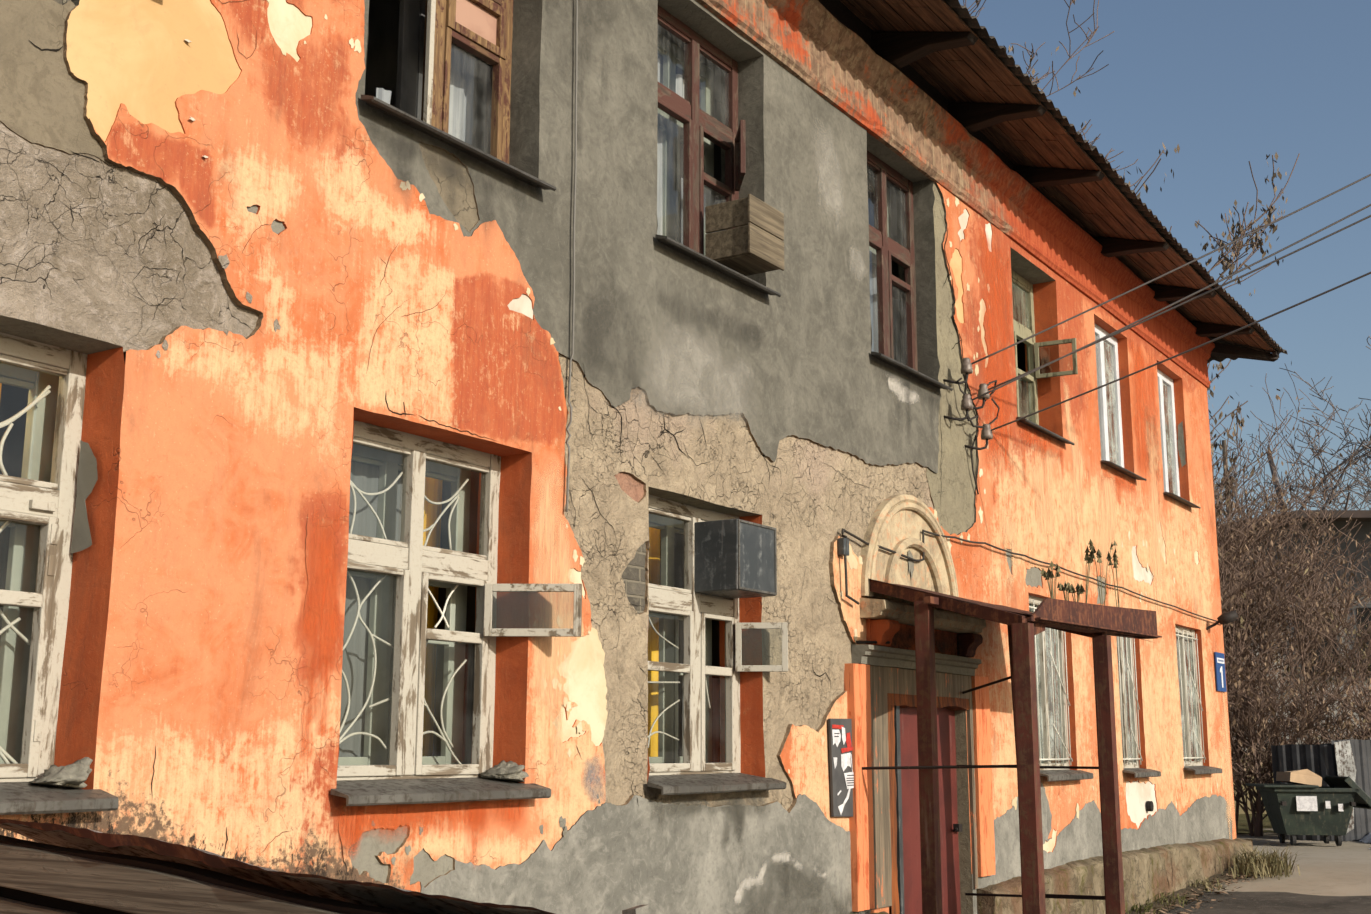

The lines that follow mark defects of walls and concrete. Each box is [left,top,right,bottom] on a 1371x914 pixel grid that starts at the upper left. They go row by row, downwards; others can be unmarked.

peeling [267,0,328,63]
spalling [0,0,287,358]
crack [0,145,223,341]
crack [583,365,867,527]
crack [570,481,621,571]
spalling [348,181,993,893]
peeling [1121,520,1175,609]
leakage [28,812,133,835]
leakage [165,826,260,865]
leakage [278,834,369,881]
peeling [1043,785,1094,853]
peeling [1121,779,1218,830]